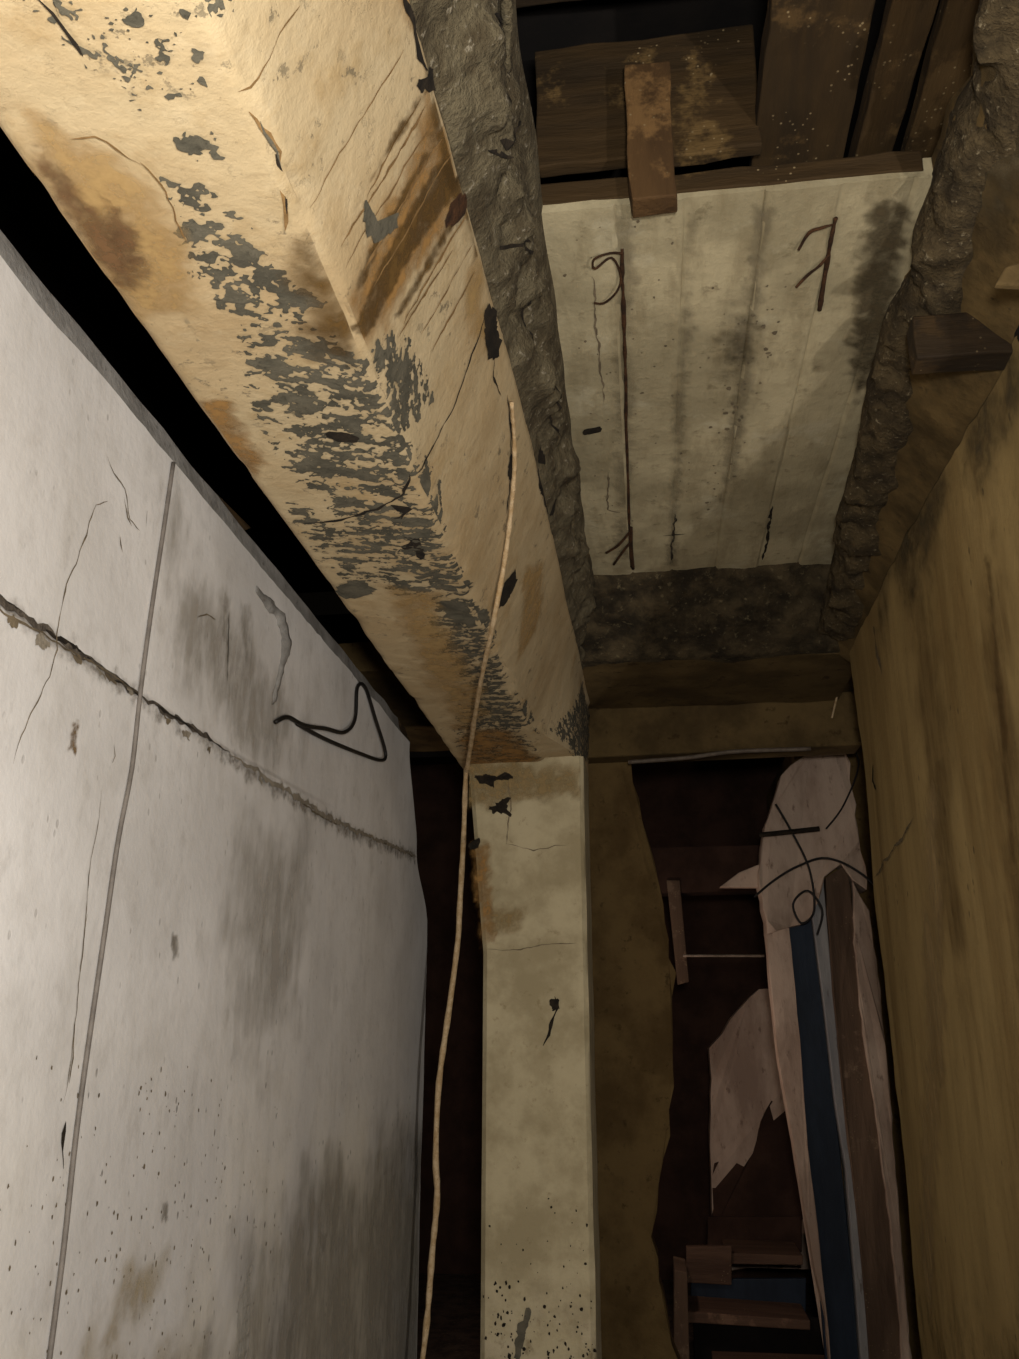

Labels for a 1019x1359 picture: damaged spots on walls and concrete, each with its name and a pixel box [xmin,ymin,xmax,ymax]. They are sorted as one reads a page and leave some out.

peeling [24,0,234,111]
crack [239,0,428,231]
rust [432,101,469,220]
peeling [159,176,590,817]
crack [304,306,512,559]
crack [521,301,534,341]
crack [549,387,562,436]
spalling [583,426,602,435]
crack [0,456,416,863]
leakage [238,1139,421,1359]